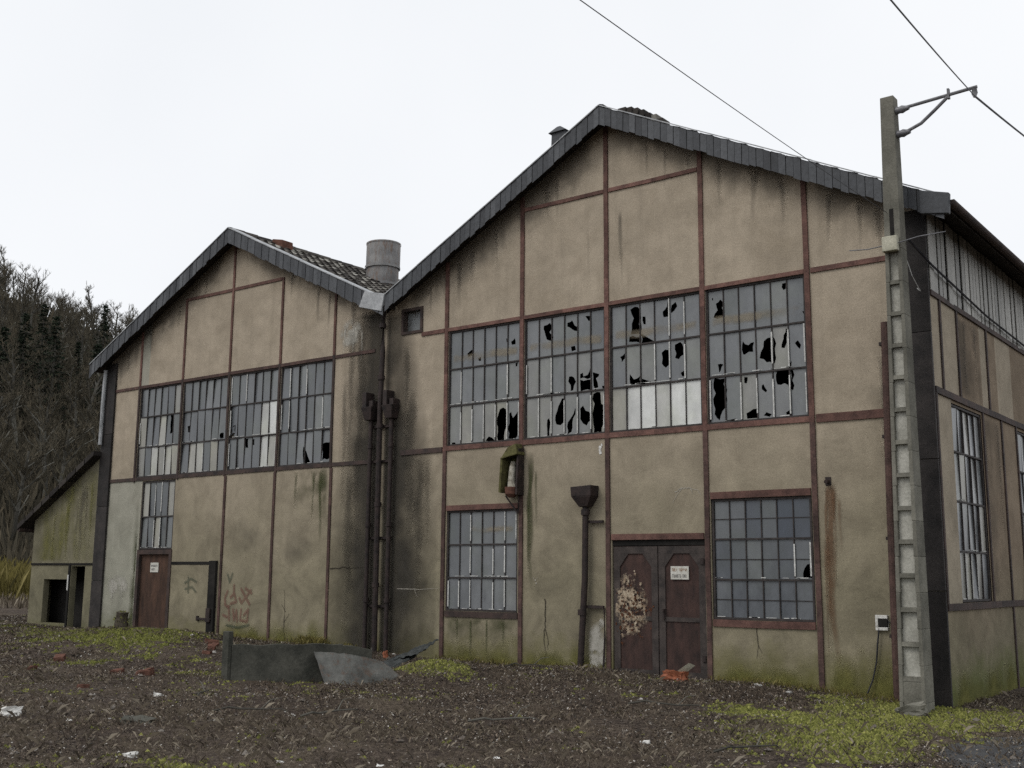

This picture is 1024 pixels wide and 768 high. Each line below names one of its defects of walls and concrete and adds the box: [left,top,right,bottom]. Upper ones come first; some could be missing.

leakage [313,474,326,507]
leakage [344,313,421,654]
corrosion [825,488,835,565]
peeling [590,570,654,668]